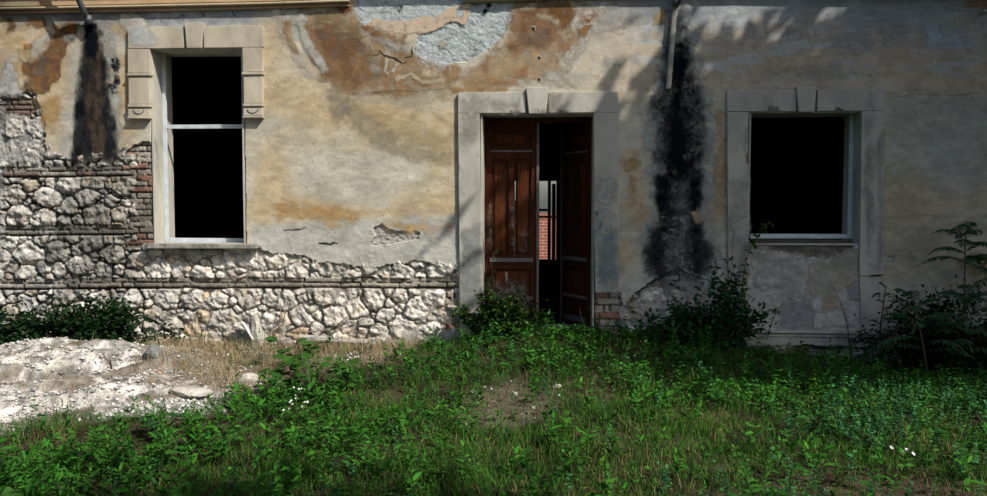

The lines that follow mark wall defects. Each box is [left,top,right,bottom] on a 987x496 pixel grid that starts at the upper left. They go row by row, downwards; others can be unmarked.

damp [119,12,157,46]
peeling [351,0,625,86]
damp [71,23,122,160]
damp [640,2,750,325]
spalling [371,223,420,247]